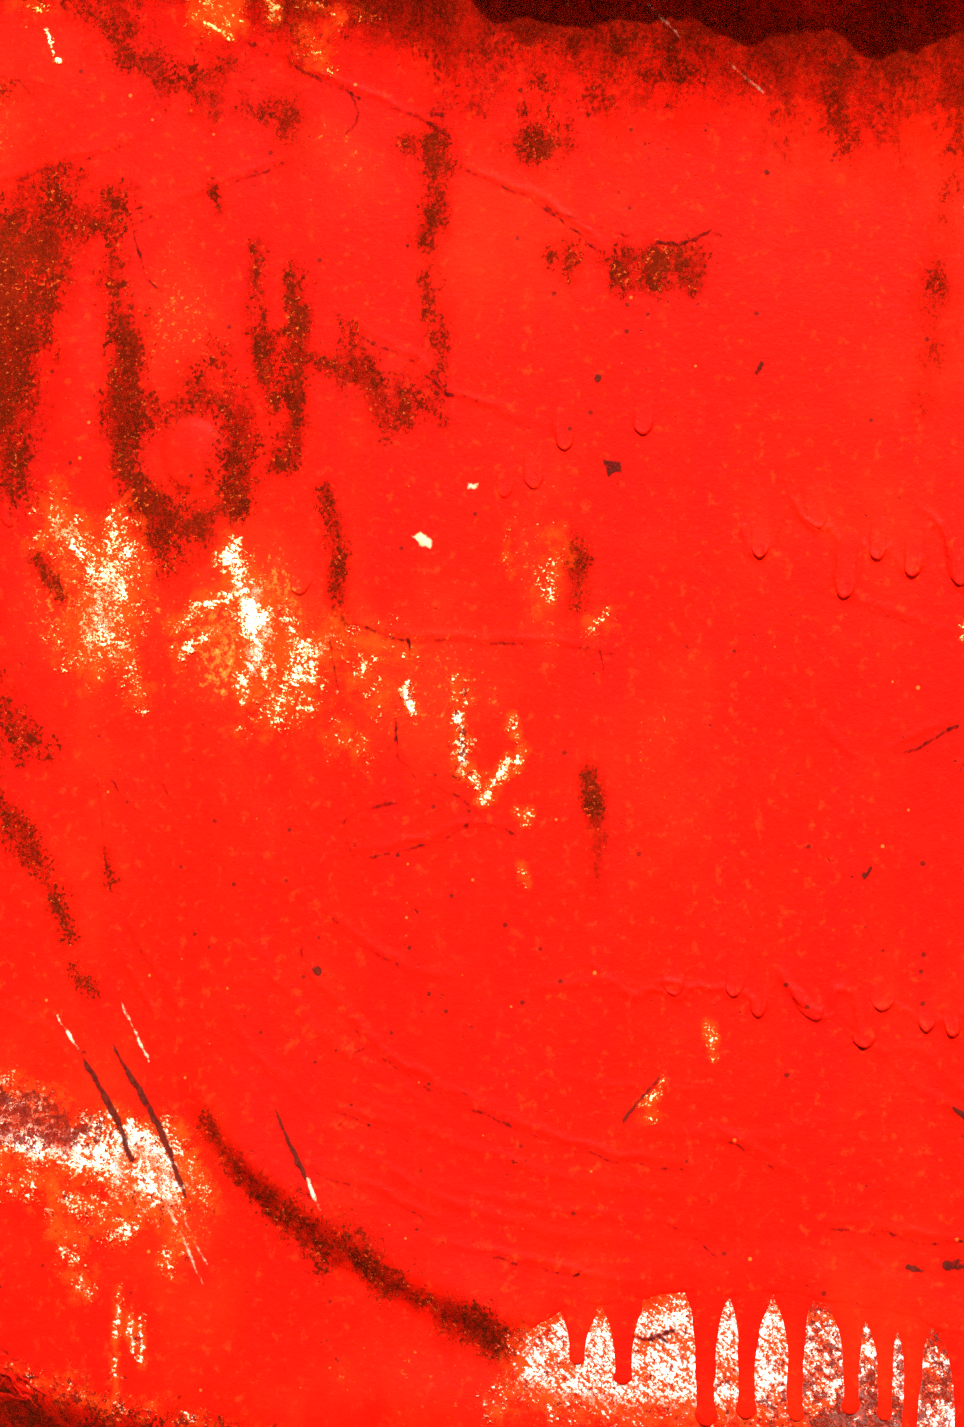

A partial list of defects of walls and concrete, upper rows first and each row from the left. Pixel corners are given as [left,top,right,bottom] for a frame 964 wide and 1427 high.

corrosion [543,233,718,308]
corrosion [0,151,427,586]
peeling [23,480,427,765]
corrosion [313,481,353,637]
peeling [415,533,431,548]
corrosion [0,668,63,768]
peeling [444,673,527,807]
corrosion [577,765,607,822]
corrosion [0,789,100,999]
peeling [0,1065,238,1427]
corrosion [195,1105,549,1365]
peeling [476,1292,955,1427]